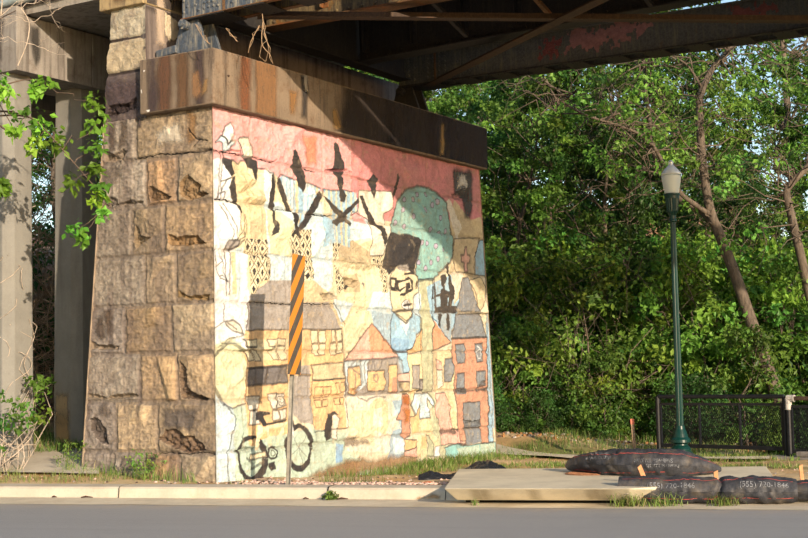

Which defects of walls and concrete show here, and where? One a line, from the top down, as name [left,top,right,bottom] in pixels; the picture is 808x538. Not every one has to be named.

peeling [537,22,653,62]
corrosion [241,56,276,117]
spalling [102,175,209,208]
spalling [168,234,206,246]
spalling [179,360,209,400]
spalling [90,417,109,444]
spalling [159,428,206,453]